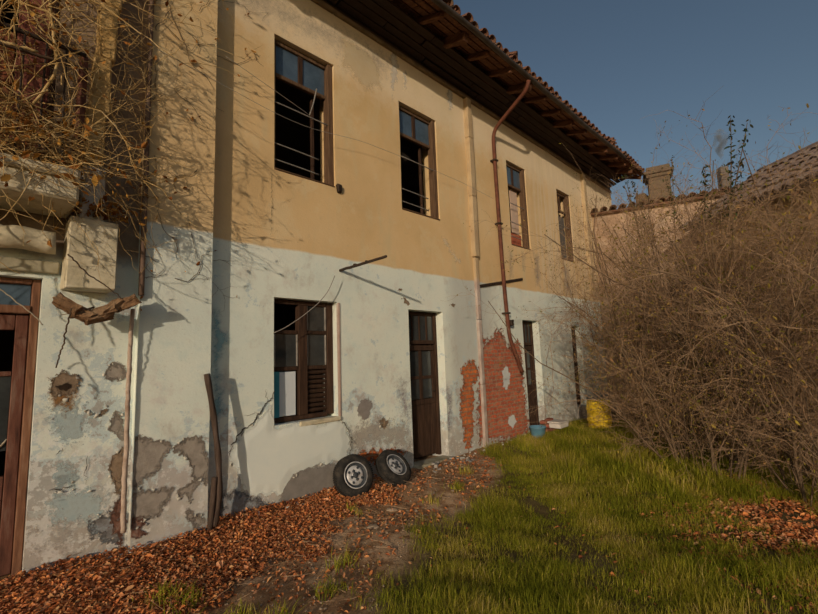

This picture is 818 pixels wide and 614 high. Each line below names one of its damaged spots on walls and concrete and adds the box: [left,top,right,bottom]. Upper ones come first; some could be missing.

spalling [102,361,127,382]
spalling [45,369,209,546]
crack [228,391,275,455]
flaking render [459,327,530,452]